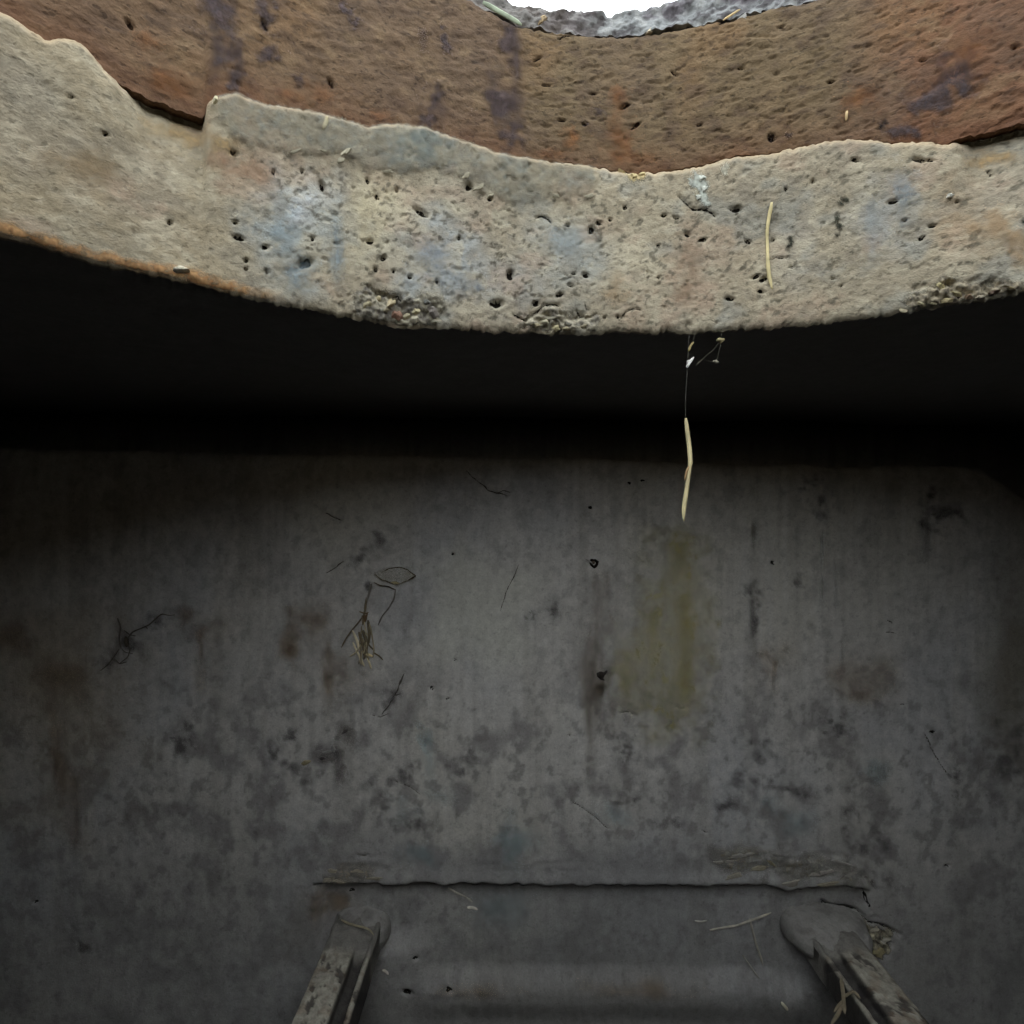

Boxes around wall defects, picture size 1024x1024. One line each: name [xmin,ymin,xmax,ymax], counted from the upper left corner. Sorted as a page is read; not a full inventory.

leakage [485,90,524,145]
leakage [878,50,974,137]
spalling [354,280,448,326]
spalling [517,273,619,332]
spalling [899,275,1023,313]